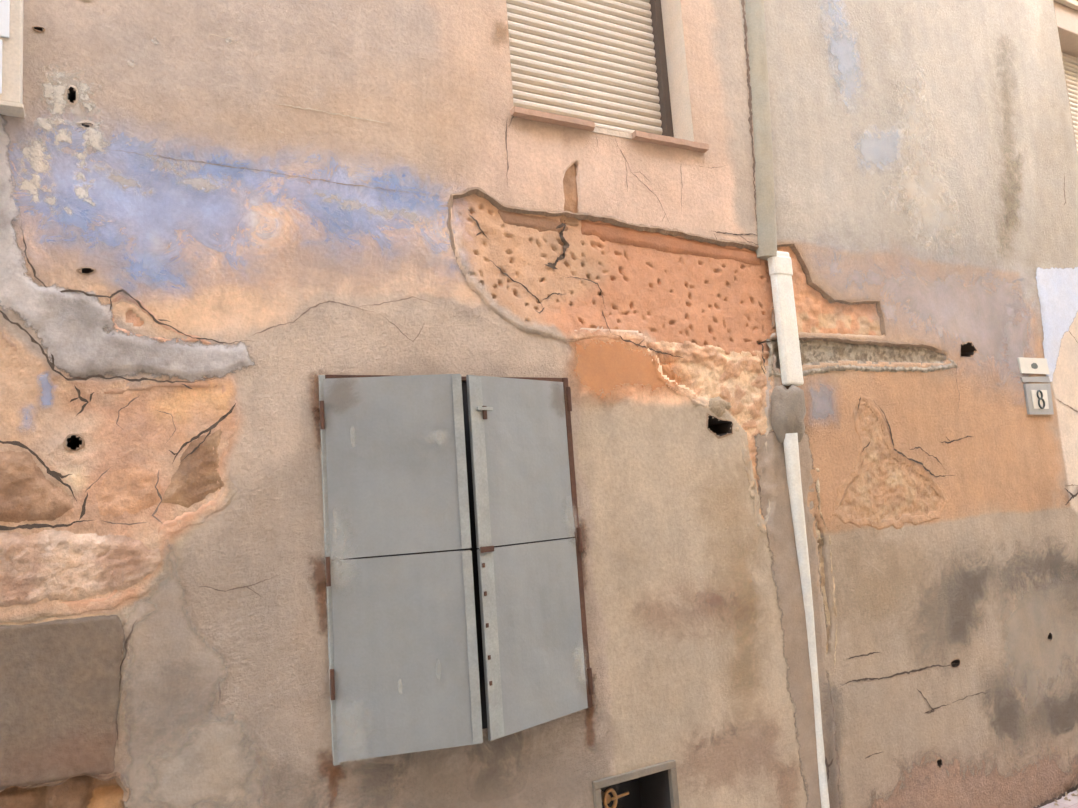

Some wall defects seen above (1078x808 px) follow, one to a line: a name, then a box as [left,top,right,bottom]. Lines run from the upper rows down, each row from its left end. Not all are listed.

crack [107,149,435,196]
spalling [8,72,781,377]
spalling [777,243,978,376]
spalling [0,312,240,623]
hole [706,413,734,439]
spalling [814,394,948,675]
crack [845,652,988,714]
water stain [1004,575,1078,708]